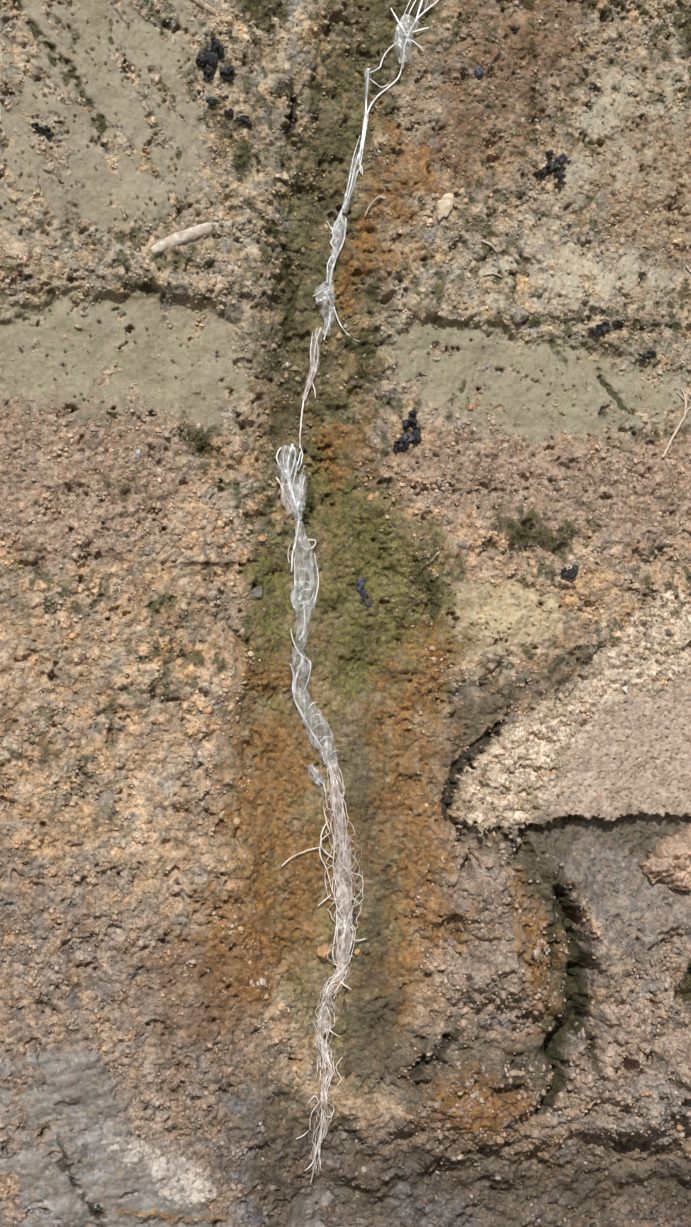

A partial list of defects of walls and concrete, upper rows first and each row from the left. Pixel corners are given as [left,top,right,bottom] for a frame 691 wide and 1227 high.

rust [474,0,573,145]
rust [321,84,490,313]
water stain [306,433,360,519]
rust [307,423,375,489]
water stain [240,541,306,672]
rust [151,619,468,1057]
water stain [343,874,555,1106]
water stain [233,1073,313,1220]
water stain [349,1140,540,1227]